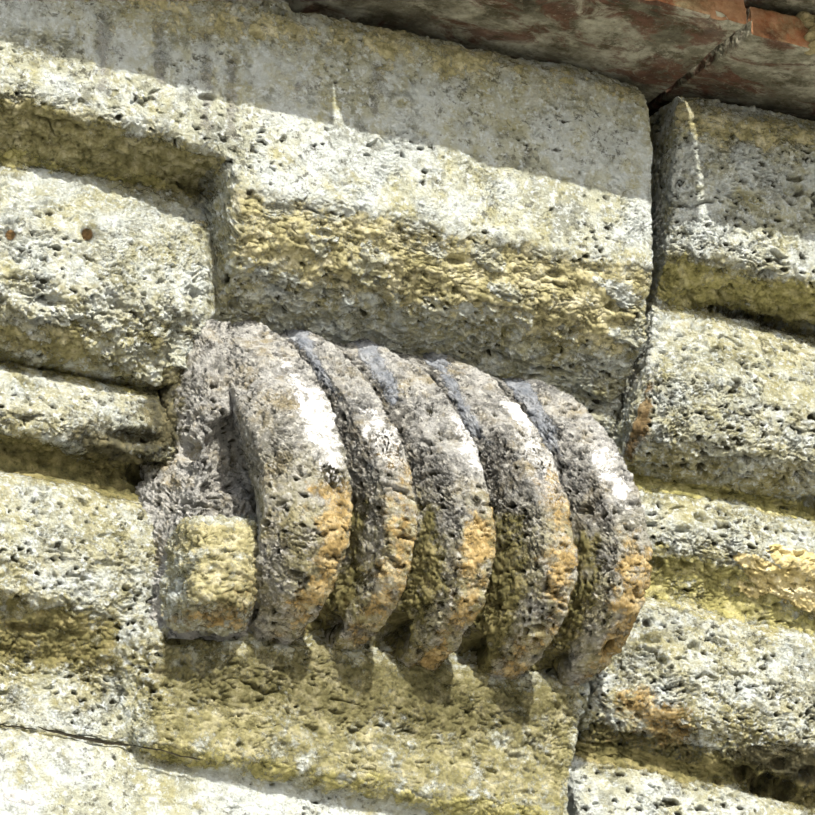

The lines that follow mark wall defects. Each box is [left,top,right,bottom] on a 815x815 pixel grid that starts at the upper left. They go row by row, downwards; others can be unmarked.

crack [0,724,203,760]